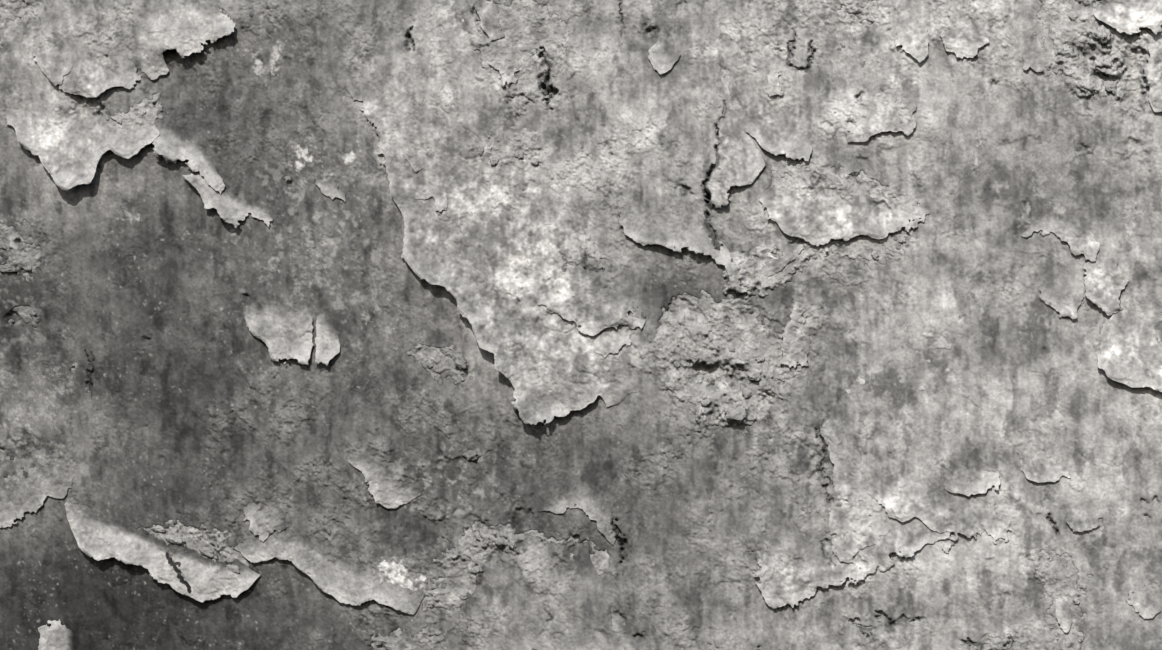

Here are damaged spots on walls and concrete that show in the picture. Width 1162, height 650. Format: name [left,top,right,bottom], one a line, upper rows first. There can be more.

flaking render [6,0,273,229]
flaking render [242,298,340,366]
flaking render [344,0,930,435]
crack [701,103,728,250]
flaking render [1021,213,1162,392]
flaking render [1022,0,1162,113]
flaking render [0,464,642,650]
flaking render [347,452,423,508]
flaking render [755,420,1012,609]
flaking render [1017,441,1071,483]